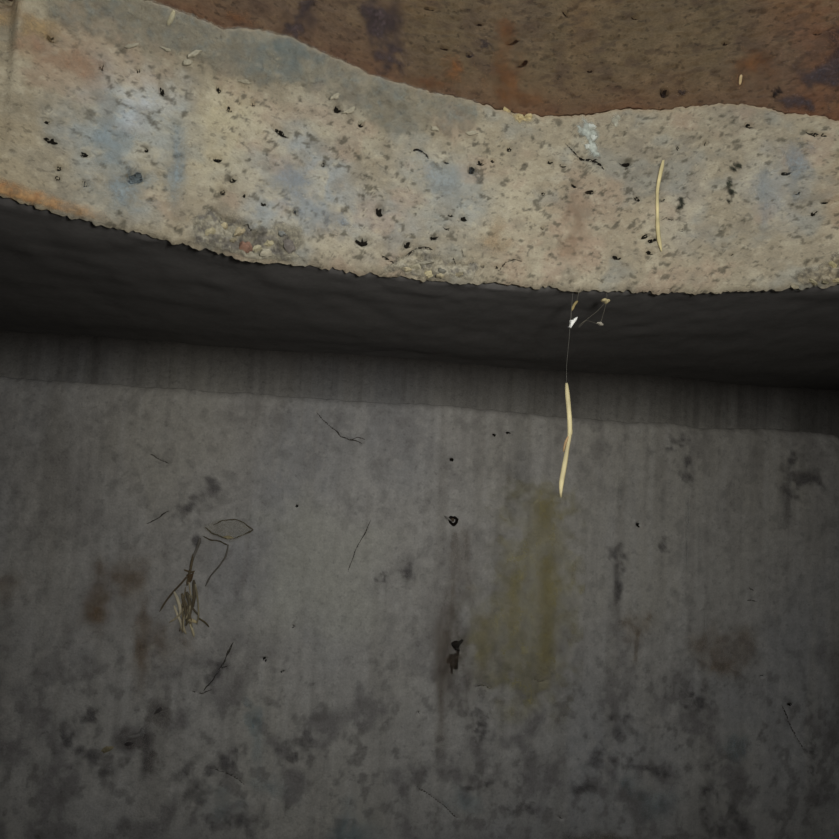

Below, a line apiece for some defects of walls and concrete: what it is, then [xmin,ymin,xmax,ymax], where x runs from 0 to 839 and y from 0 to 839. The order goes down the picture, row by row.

spalling [194,209,306,261]
spalling [385,242,484,280]
spalling [791,254,839,289]